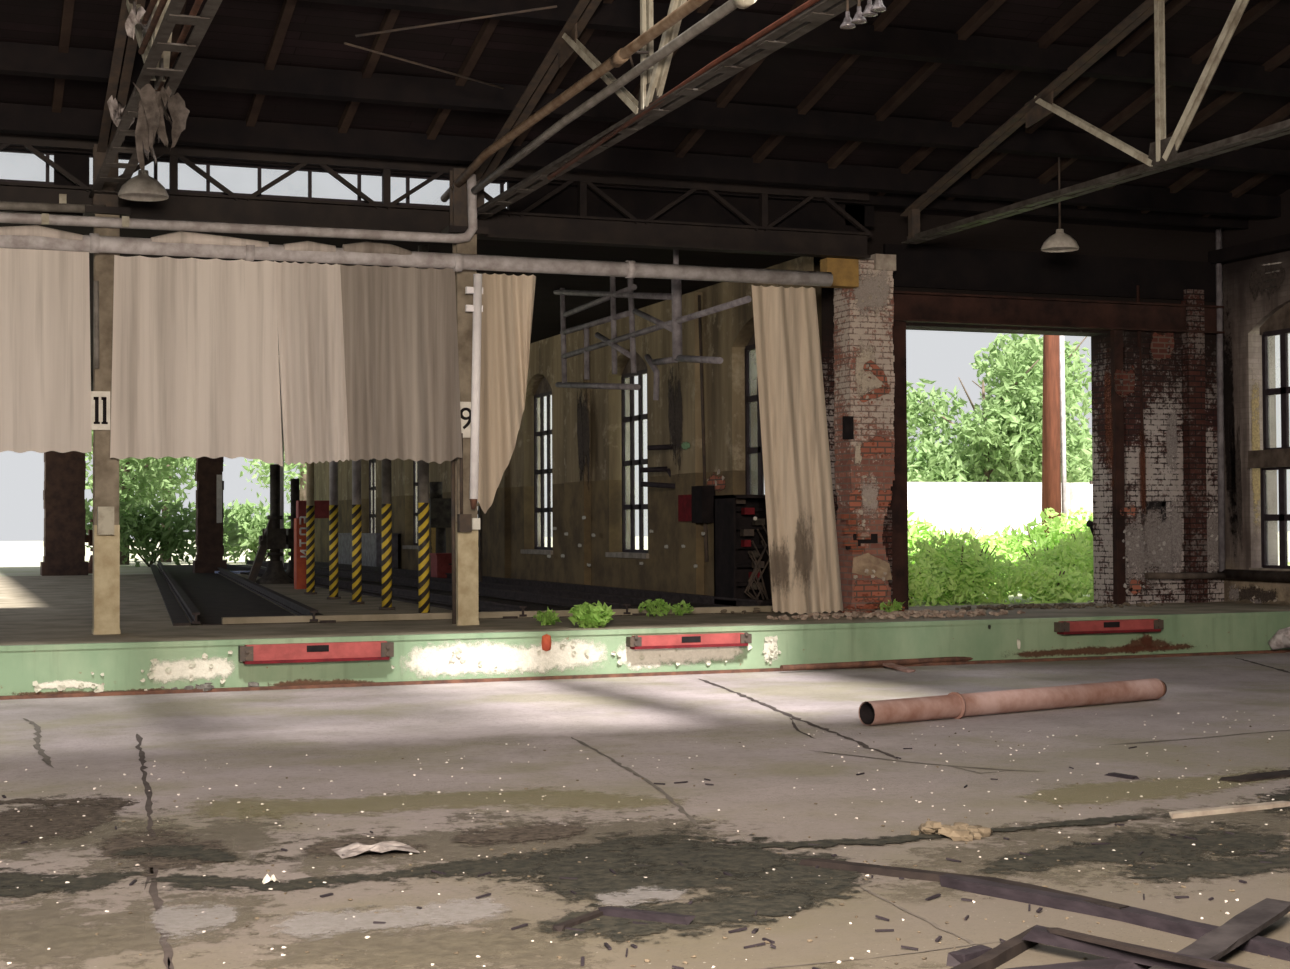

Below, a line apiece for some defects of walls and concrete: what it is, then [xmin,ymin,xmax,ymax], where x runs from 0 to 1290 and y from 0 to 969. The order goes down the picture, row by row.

spalling [1150,332,1175,366]
spalling [840,436,893,552]
peeling [1207,497,1278,604]
crack [23,718,54,768]
crack [135,734,174,969]
leakage [0,767,1290,969]